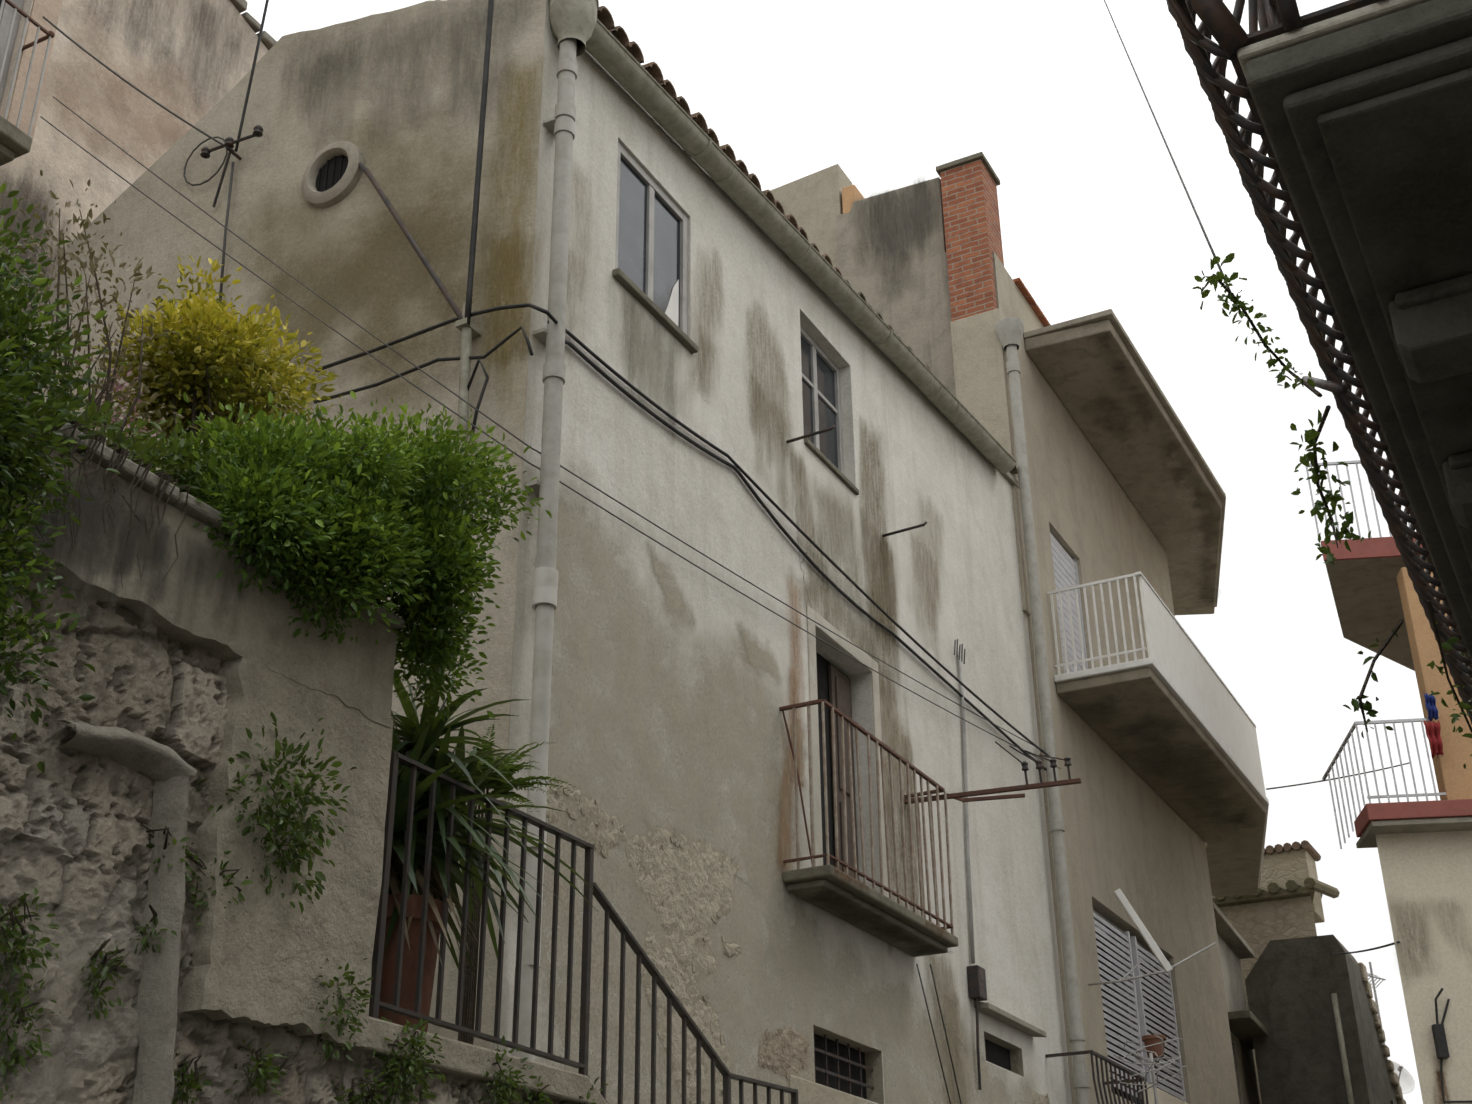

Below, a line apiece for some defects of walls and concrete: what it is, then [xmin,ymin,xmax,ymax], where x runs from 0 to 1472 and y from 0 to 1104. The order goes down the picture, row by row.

peeling [540,500,1050,1104]
water stain [814,432,917,912]